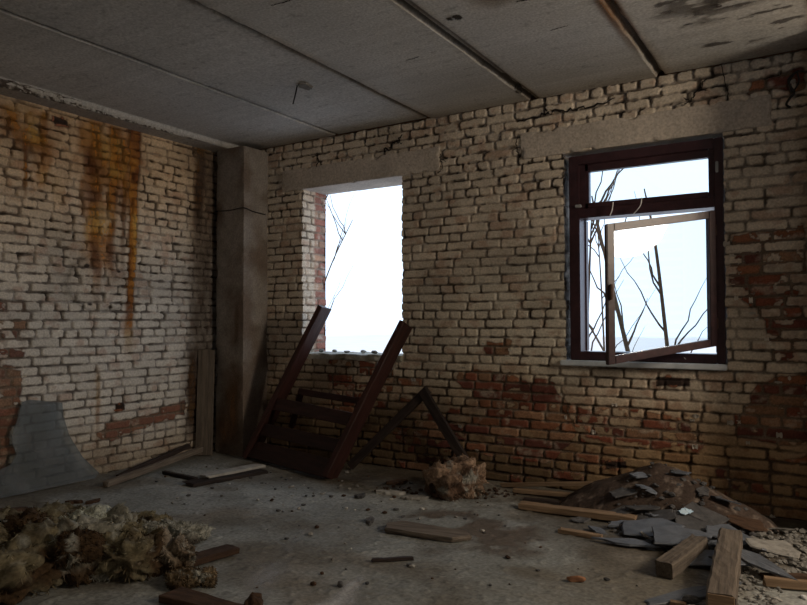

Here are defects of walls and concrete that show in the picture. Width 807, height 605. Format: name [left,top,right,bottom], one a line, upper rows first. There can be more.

damp [655,0,751,26]
damp [740,5,803,28]
crack [681,65,729,106]
crack [512,97,615,158]
rust [82,122,141,329]
peeling [482,339,512,357]
peeling [0,302,27,485]
peeling [347,365,705,481]
peeling [727,375,807,446]
flaking render [376,490,431,501]